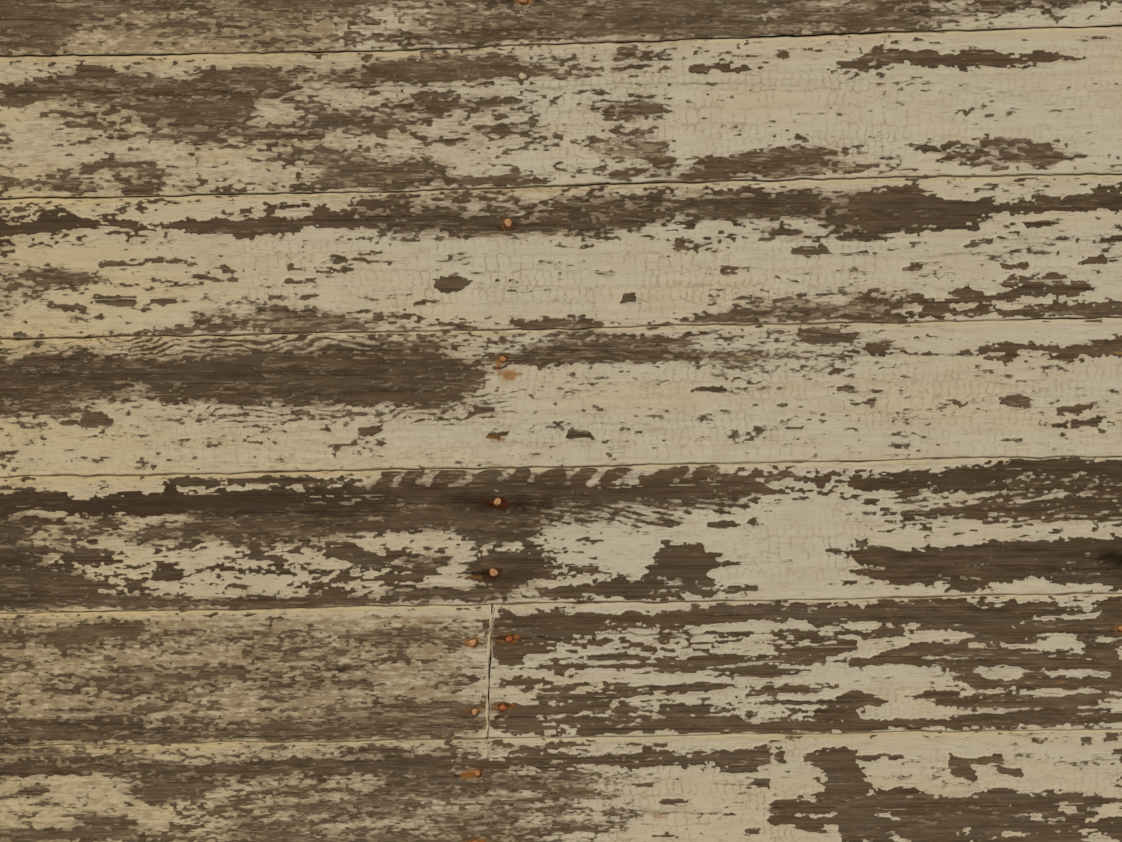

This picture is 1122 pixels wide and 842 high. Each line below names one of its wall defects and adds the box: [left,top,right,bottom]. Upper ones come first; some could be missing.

peeling [0,0,1122,479]
corrosion [465,569,502,578]
peeling [0,325,1122,842]